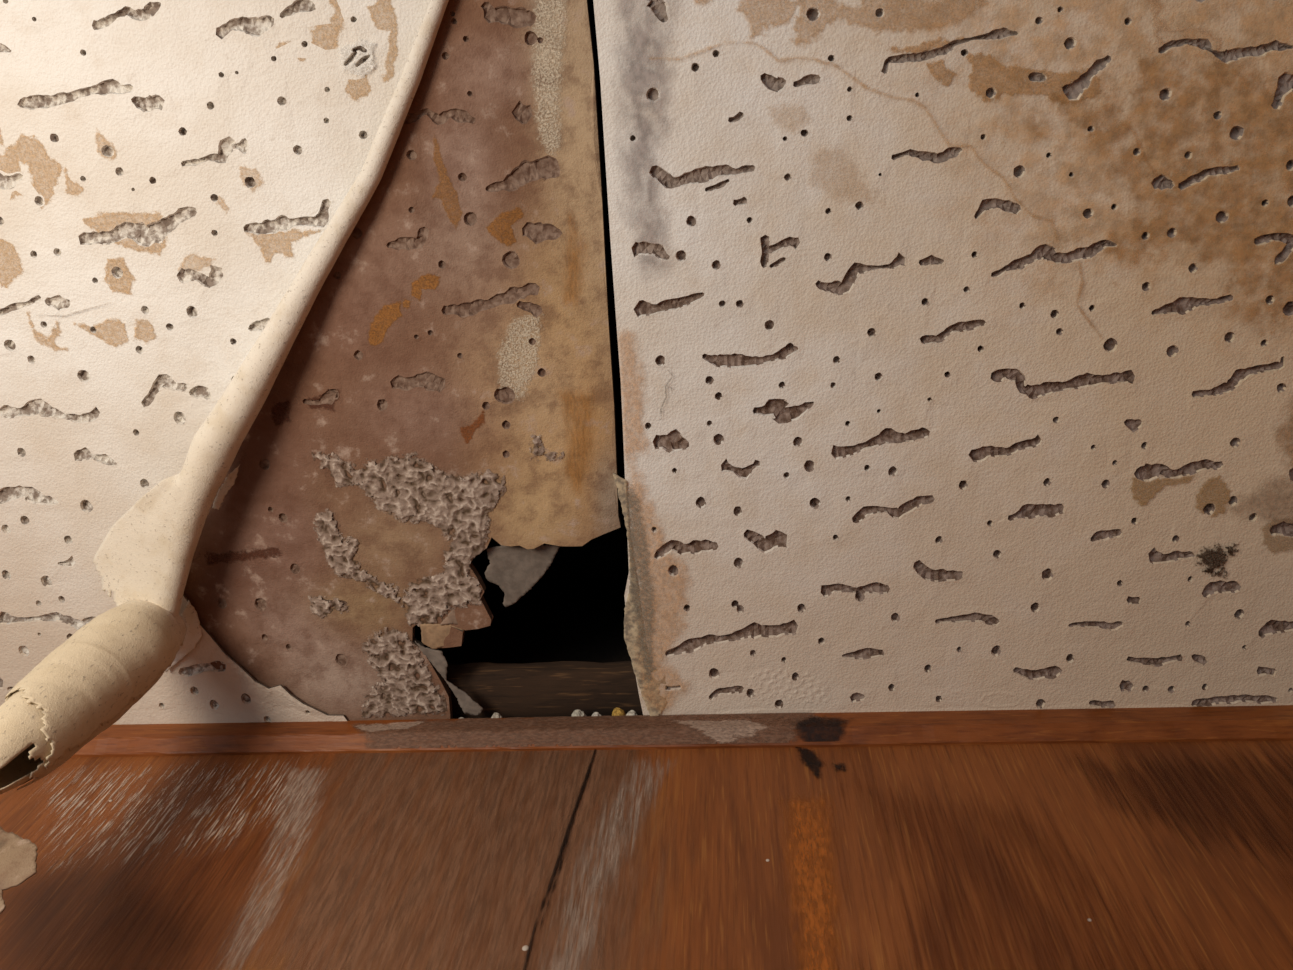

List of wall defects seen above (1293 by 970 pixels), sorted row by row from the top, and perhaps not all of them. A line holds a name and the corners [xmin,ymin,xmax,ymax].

leakage [737,0,1293,317]
peeling [0,0,621,795]
leakage [1131,475,1231,516]
leakage [1195,543,1239,579]
leakage [796,717,846,778]
peeling [0,826,38,914]
leakage [48,762,322,970]
crack [524,749,596,970]